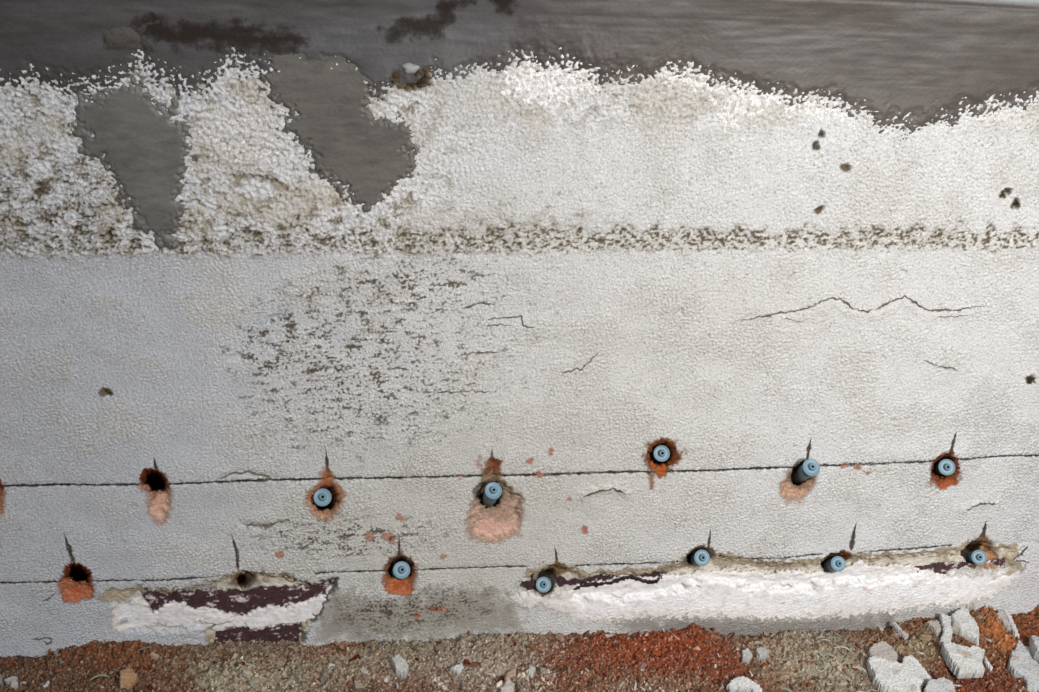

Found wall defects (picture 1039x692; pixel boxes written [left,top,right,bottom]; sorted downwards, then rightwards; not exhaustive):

leakage [132,12,302,53]
leakage [379,0,475,42]
hole [391,63,430,91]
crack [743,295,992,322]
corrosion [477,458,503,475]
corrosion [643,439,682,489]
spalling [58,564,339,645]